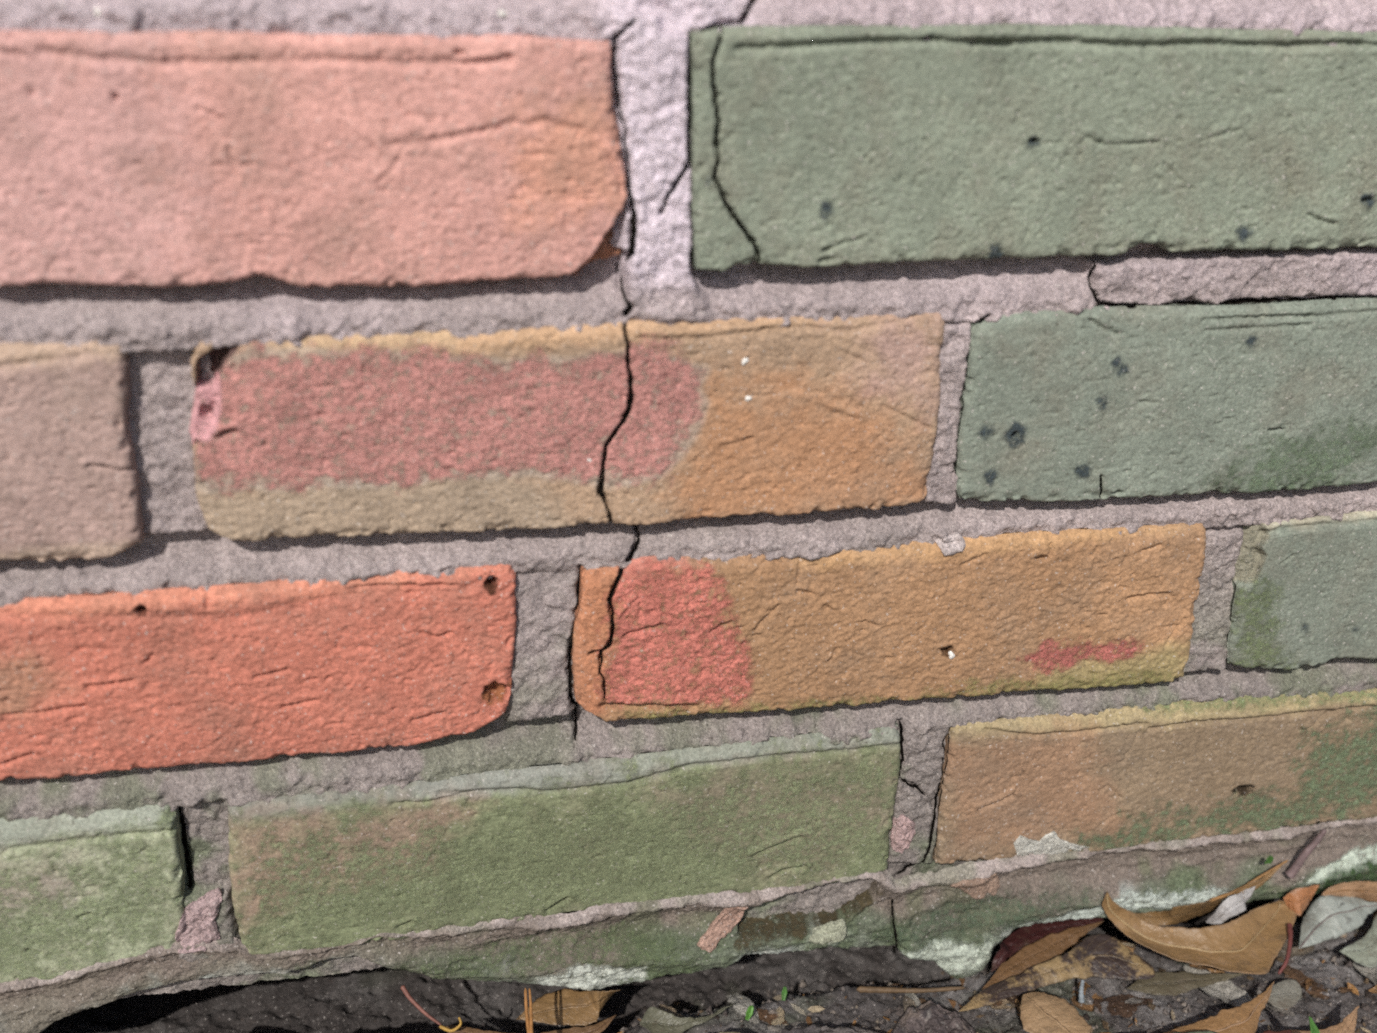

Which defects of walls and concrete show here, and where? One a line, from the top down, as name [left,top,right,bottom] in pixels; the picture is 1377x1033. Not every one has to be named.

crack [1087,260,1377,308]
crack [568,0,760,741]
spalling [1232,785,1254,795]
crack [891,720,951,953]
spalling [697,883,883,953]
peeling [950,873,1000,899]